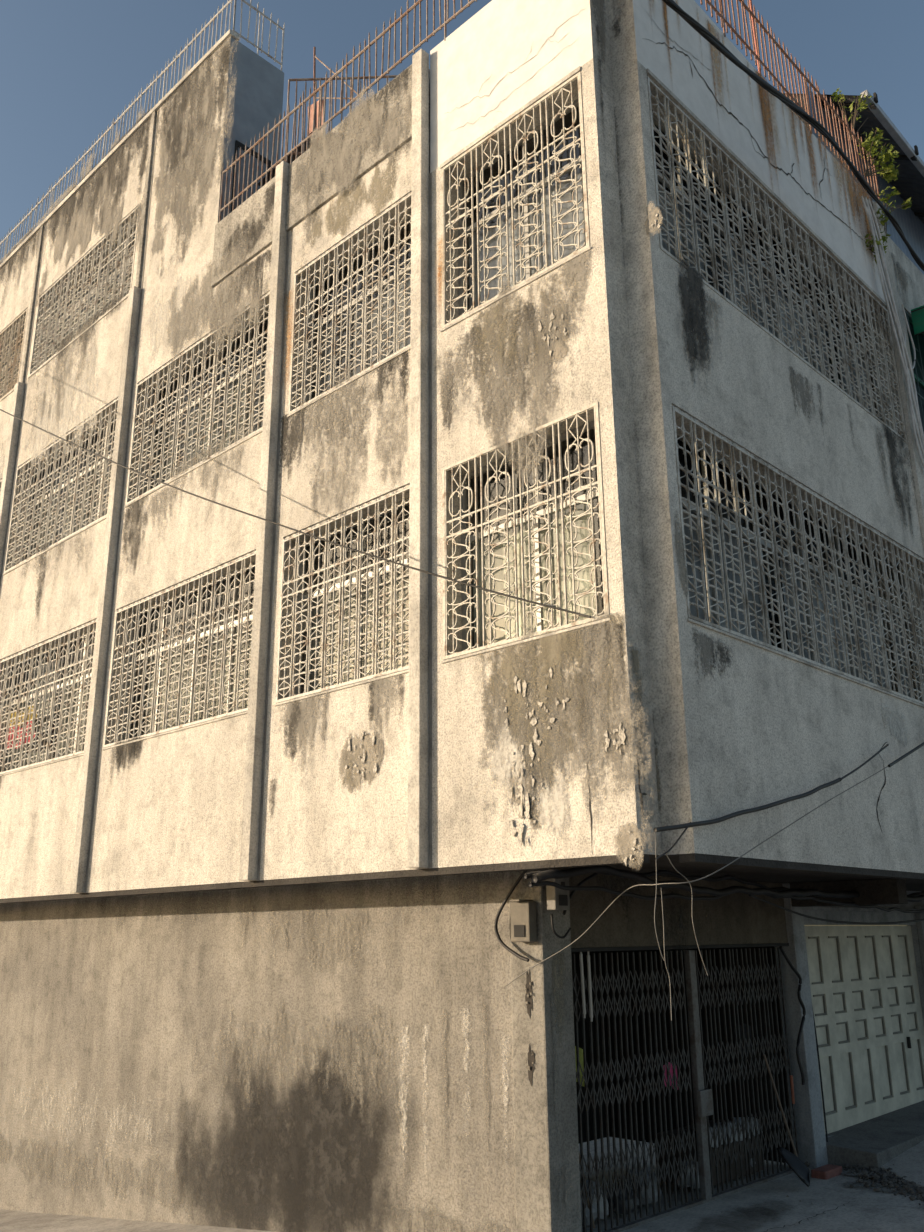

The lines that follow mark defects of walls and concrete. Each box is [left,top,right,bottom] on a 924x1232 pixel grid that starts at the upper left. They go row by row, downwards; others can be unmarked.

water stain [0,36,236,303]
crack [444,9,584,136]
crack [645,10,867,245]
rust [749,73,874,251]
water stain [280,352,408,474]
water stain [436,251,590,447]
peeling [498,667,583,845]
water stain [481,615,661,837]
spalling [603,720,632,761]
water stain [0,1005,507,1232]
spalling [525,967,533,1017]
spalling [525,1043,535,1087]